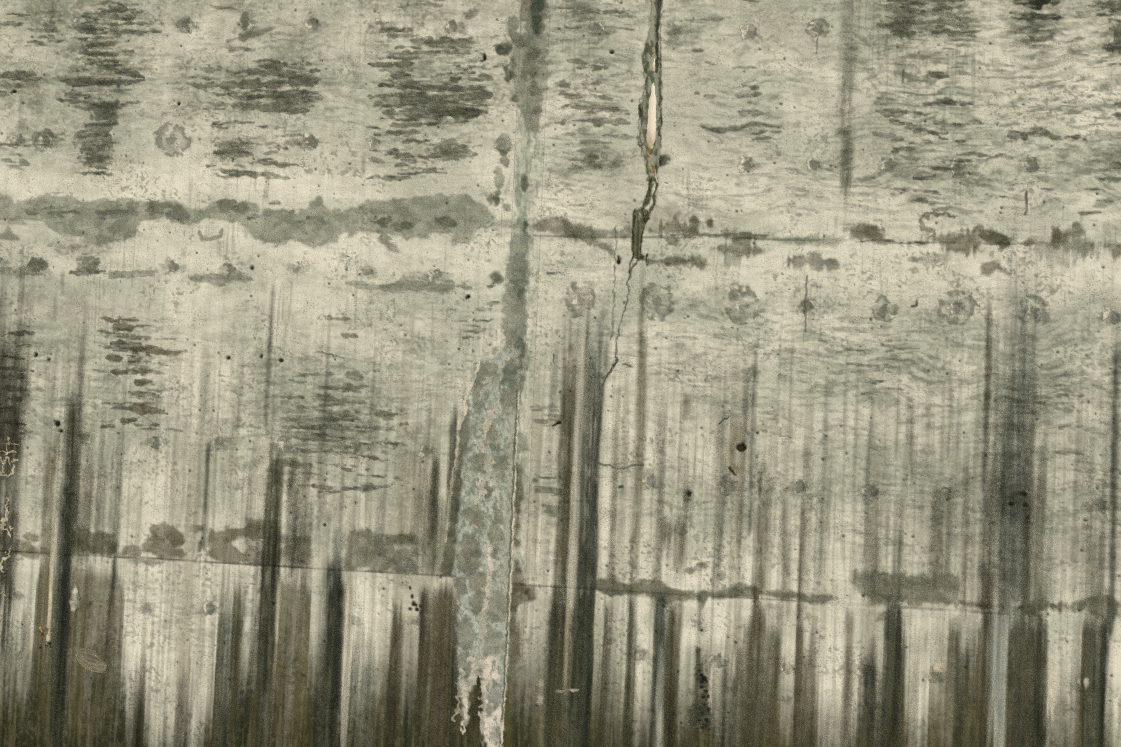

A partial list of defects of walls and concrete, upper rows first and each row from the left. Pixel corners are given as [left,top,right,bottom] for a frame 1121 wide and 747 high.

leakage [495,0,548,132]
crack [596,0,669,420]
leakage [851,211,1010,256]
leakage [1024,223,1093,253]
leakage [821,259,838,270]
crack [598,461,644,469]